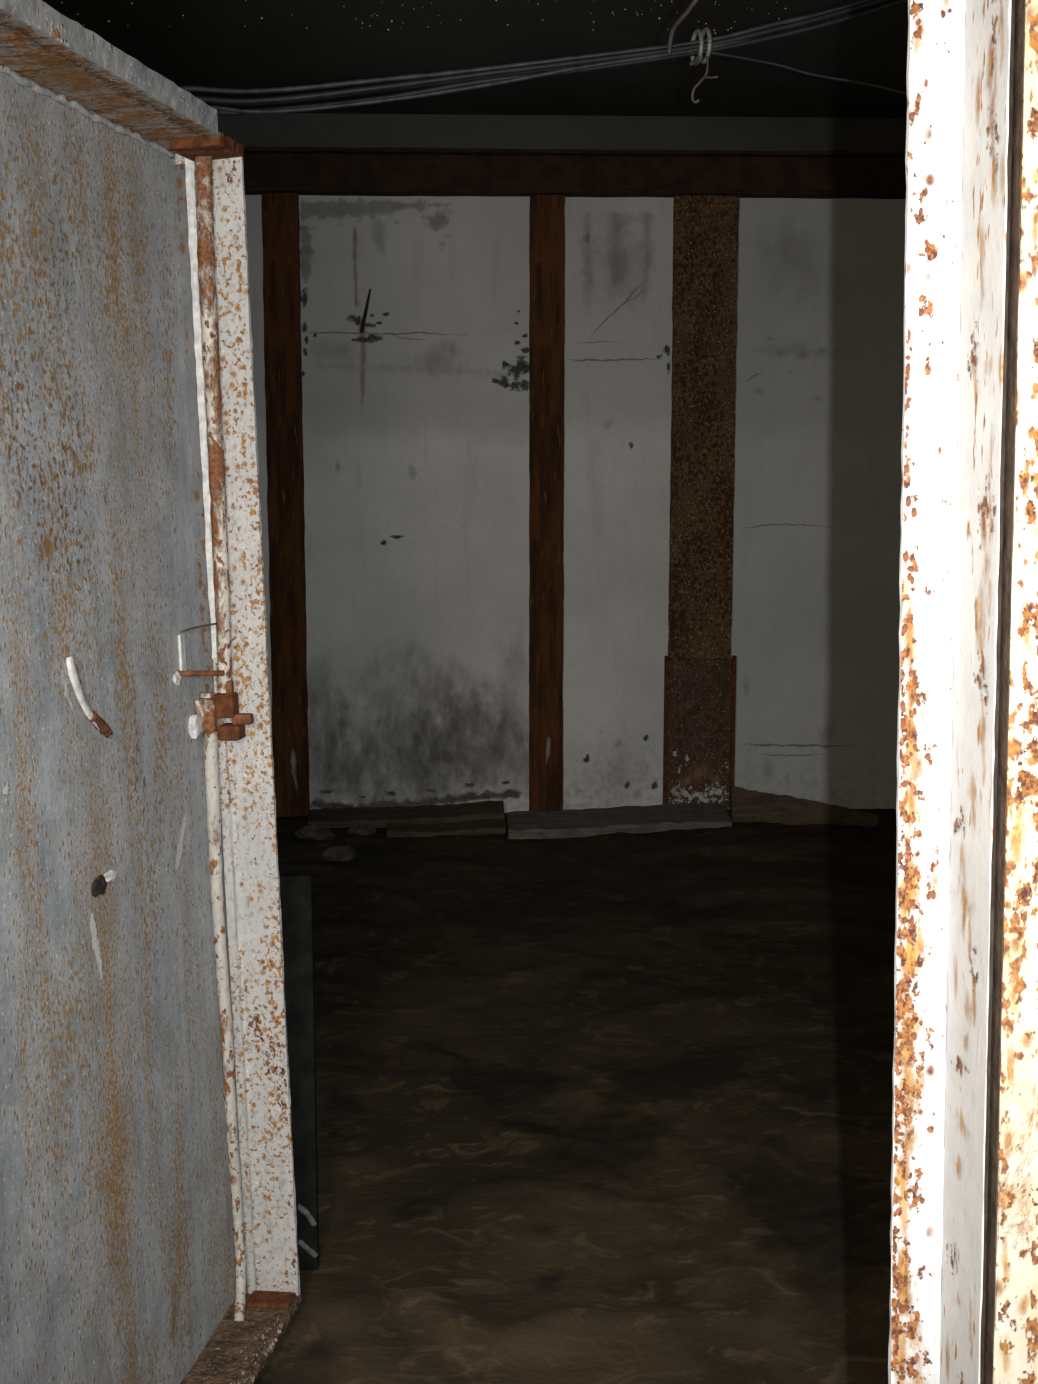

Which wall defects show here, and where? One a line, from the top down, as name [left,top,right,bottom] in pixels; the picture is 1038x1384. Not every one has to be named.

rust [911,0,923,45]
rust [909,90,932,128]
rust [912,187,939,260]
rust [967,321,978,396]
rust [903,294,934,522]
rust [1023,499,1036,530]
rust [1017,591,1038,640]
rust [1012,660,1038,859]
rust [1013,861,1038,948]
rust [891,546,939,1384]
rust [998,1300,1026,1331]
rust [1017,1371,1036,1384]